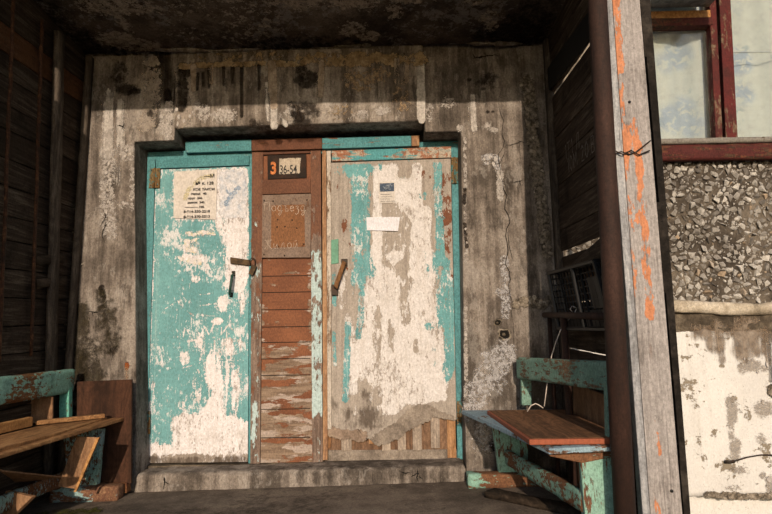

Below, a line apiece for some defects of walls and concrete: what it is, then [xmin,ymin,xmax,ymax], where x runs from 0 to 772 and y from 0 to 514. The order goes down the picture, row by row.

water stain [111,62,141,96]
water stain [149,51,456,130]
water stain [456,72,498,134]
water stain [72,285,121,416]
water stain [691,316,772,374]
peeling [737,358,769,373]
peeling [755,384,772,418]
peeling [726,397,746,474]
spalling [704,473,772,501]